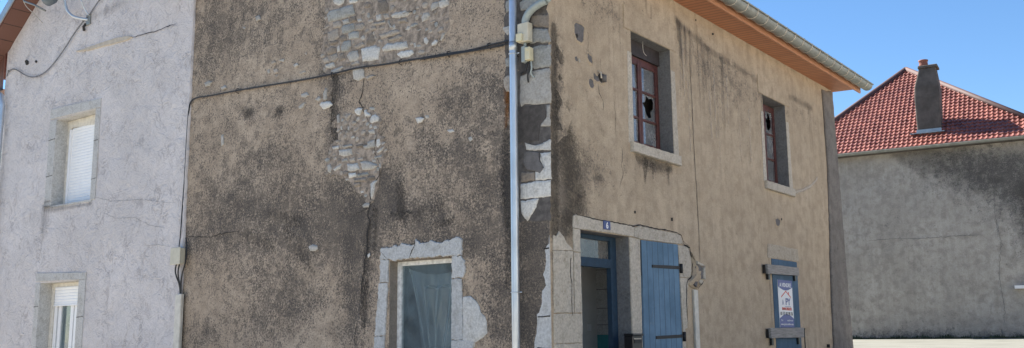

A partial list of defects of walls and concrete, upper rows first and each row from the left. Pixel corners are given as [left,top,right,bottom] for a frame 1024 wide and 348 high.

peeling [320,0,451,81]
peeling [298,88,388,208]
crack [358,74,415,302]
peeling [503,0,552,222]
peeling [462,296,488,348]